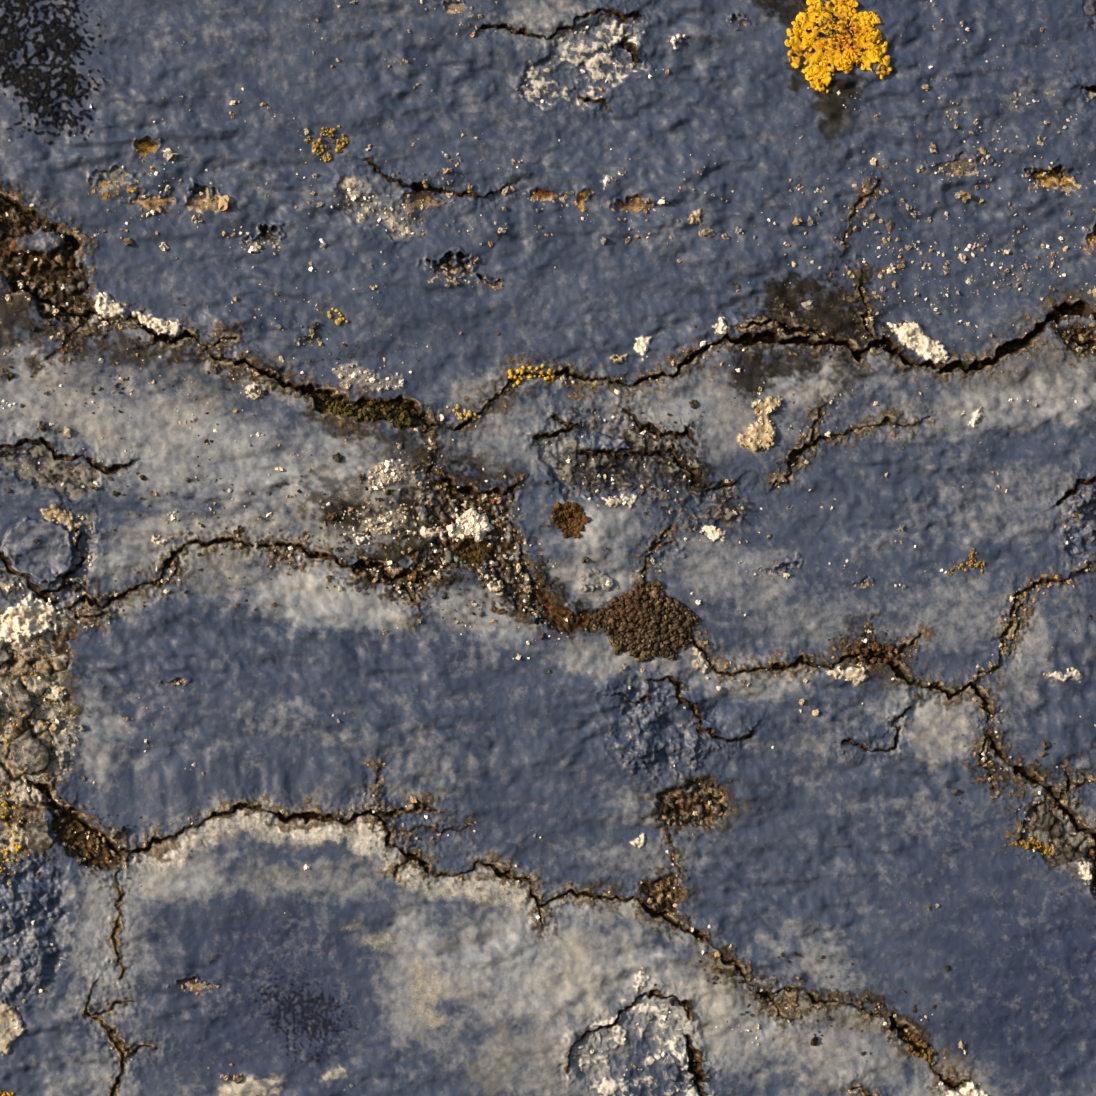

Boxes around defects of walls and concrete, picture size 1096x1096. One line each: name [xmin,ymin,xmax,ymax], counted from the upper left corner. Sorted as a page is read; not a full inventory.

crack [0,177,1096,532]
damp [730,346,868,454]
damp [742,261,949,364]
peeling [0,436,132,501]
crack [63,528,441,636]
crack [630,517,680,585]
spalling [0,511,130,890]
crack [691,559,1096,866]
crack [23,756,980,1096]